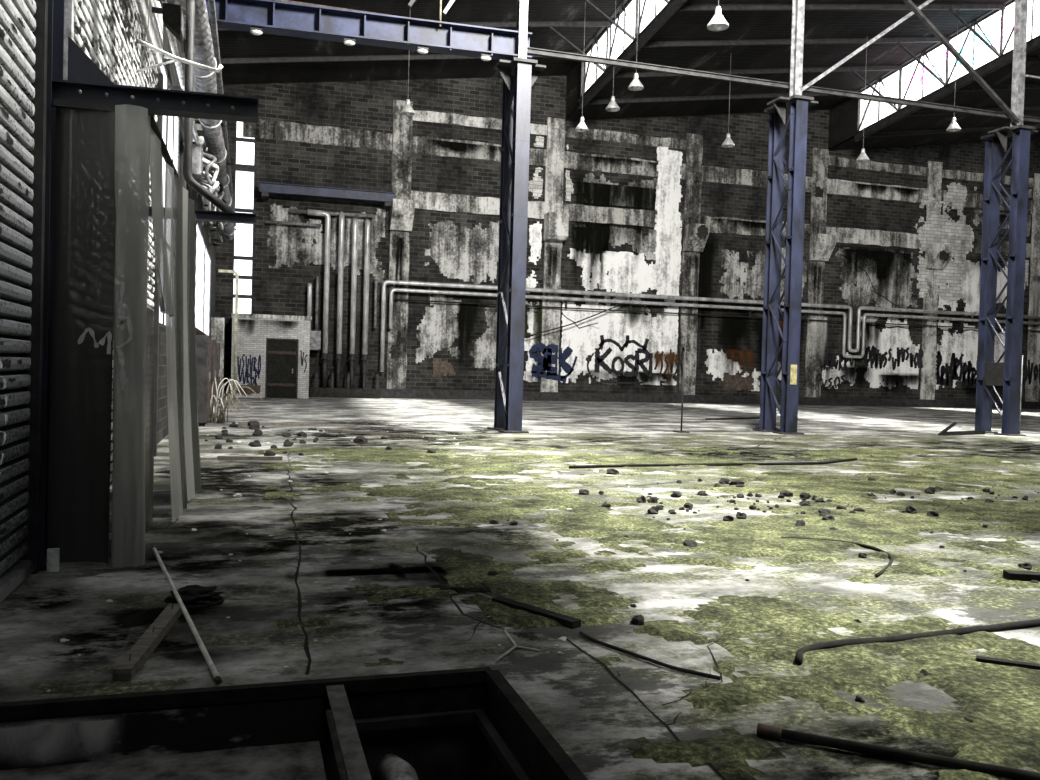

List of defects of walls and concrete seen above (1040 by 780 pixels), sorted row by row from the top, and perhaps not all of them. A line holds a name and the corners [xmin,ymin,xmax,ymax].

peeling [528,167,543,199]
peeling [424,220,499,285]
peeling [560,146,683,386]
spalling [696,225,708,238]
peeling [821,182,983,390]
peeling [996,262,1008,308]
peeling [389,294,497,378]
peeling [705,349,761,391]
peeling [994,327,1005,362]
crack [147,453,559,675]
crack [551,639,723,742]
crack [708,763,726,780]